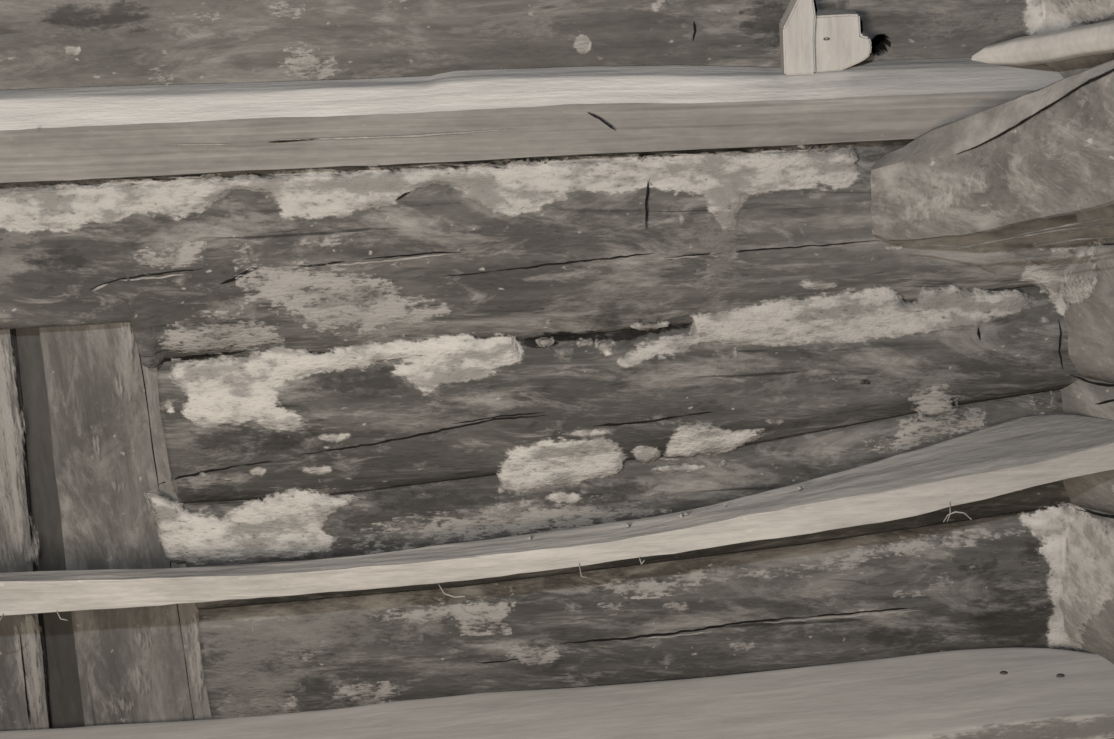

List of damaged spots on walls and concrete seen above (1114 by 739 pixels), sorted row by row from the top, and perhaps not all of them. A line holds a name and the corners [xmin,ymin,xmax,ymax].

crack [299,412,544,455]
crack [598,412,711,426]